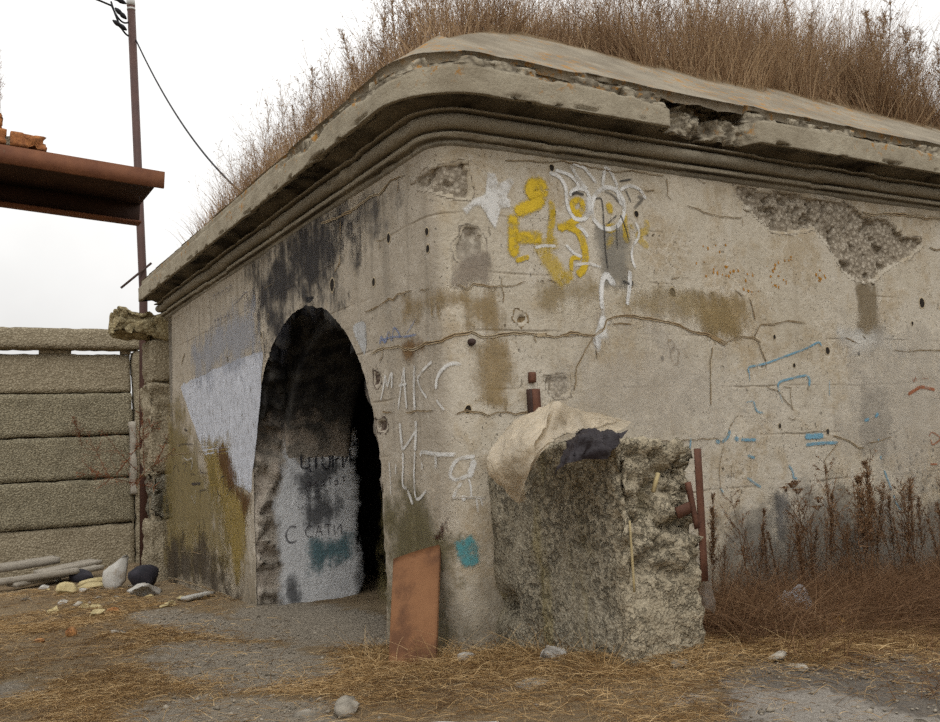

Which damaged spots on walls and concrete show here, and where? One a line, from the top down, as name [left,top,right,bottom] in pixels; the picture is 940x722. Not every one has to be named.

spalling [409,159,475,201]
spalling [732,183,924,285]
crack [862,211,940,220]
leakage [431,295,511,405]
crack [371,291,804,420]
leakage [624,290,747,334]
leakage [837,283,885,352]
crack [662,415,742,496]
leakage [165,406,247,600]